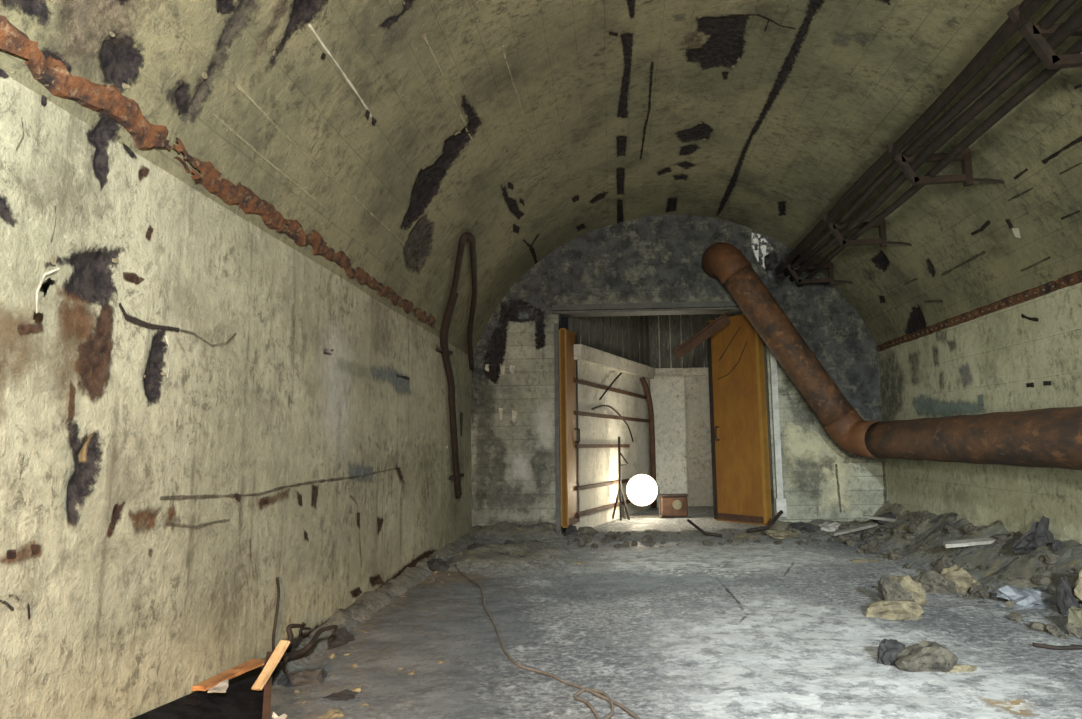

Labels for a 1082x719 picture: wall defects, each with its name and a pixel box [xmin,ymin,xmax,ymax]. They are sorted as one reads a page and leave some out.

flaking render [2,0,160,92]
spalling [685,14,750,80]
crack [748,14,796,31]
rust [0,15,436,329]
spalling [401,95,482,273]
rust [877,270,1082,352]
spalling [35,246,144,526]
spalling [144,329,171,406]